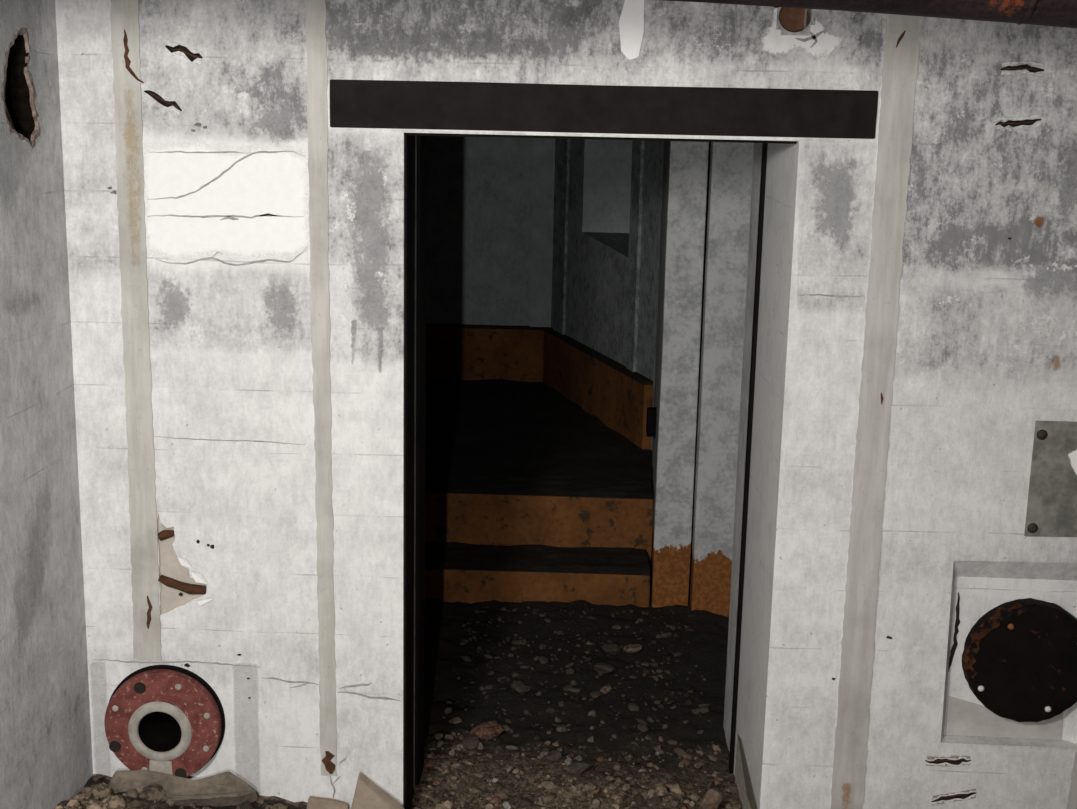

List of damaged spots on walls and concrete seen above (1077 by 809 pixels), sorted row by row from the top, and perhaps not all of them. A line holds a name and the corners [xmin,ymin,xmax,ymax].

leakage [349,29,545,60]
flaking render [761,8,843,57]
spalling [1,27,41,148]
crack [147,151,305,220]
crack [156,246,308,266]
leakage [351,156,388,371]
leakage [1024,263,1077,294]
flaking render [157,511,214,615]
spalling [931,789,976,805]